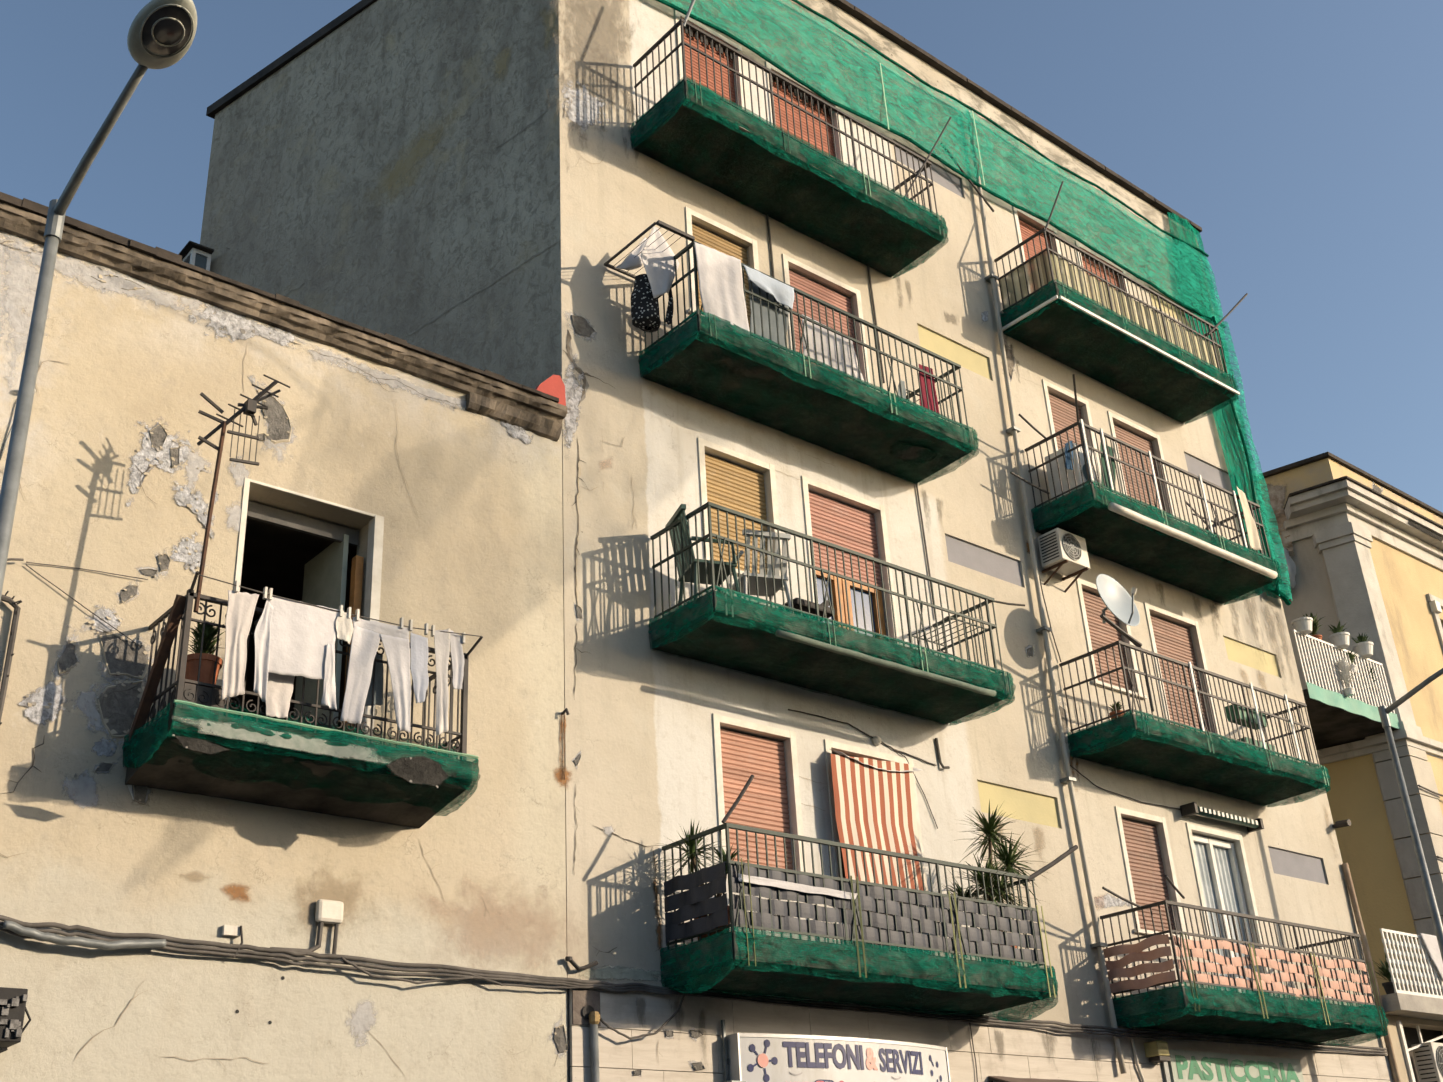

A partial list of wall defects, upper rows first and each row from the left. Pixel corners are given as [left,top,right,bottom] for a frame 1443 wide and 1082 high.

peeling [561,80,608,132]
flaking render [249,376,296,460]
flaking render [18,419,219,745]
peeling [63,761,116,808]
peeling [172,721,449,788]
rust [555,719,570,785]